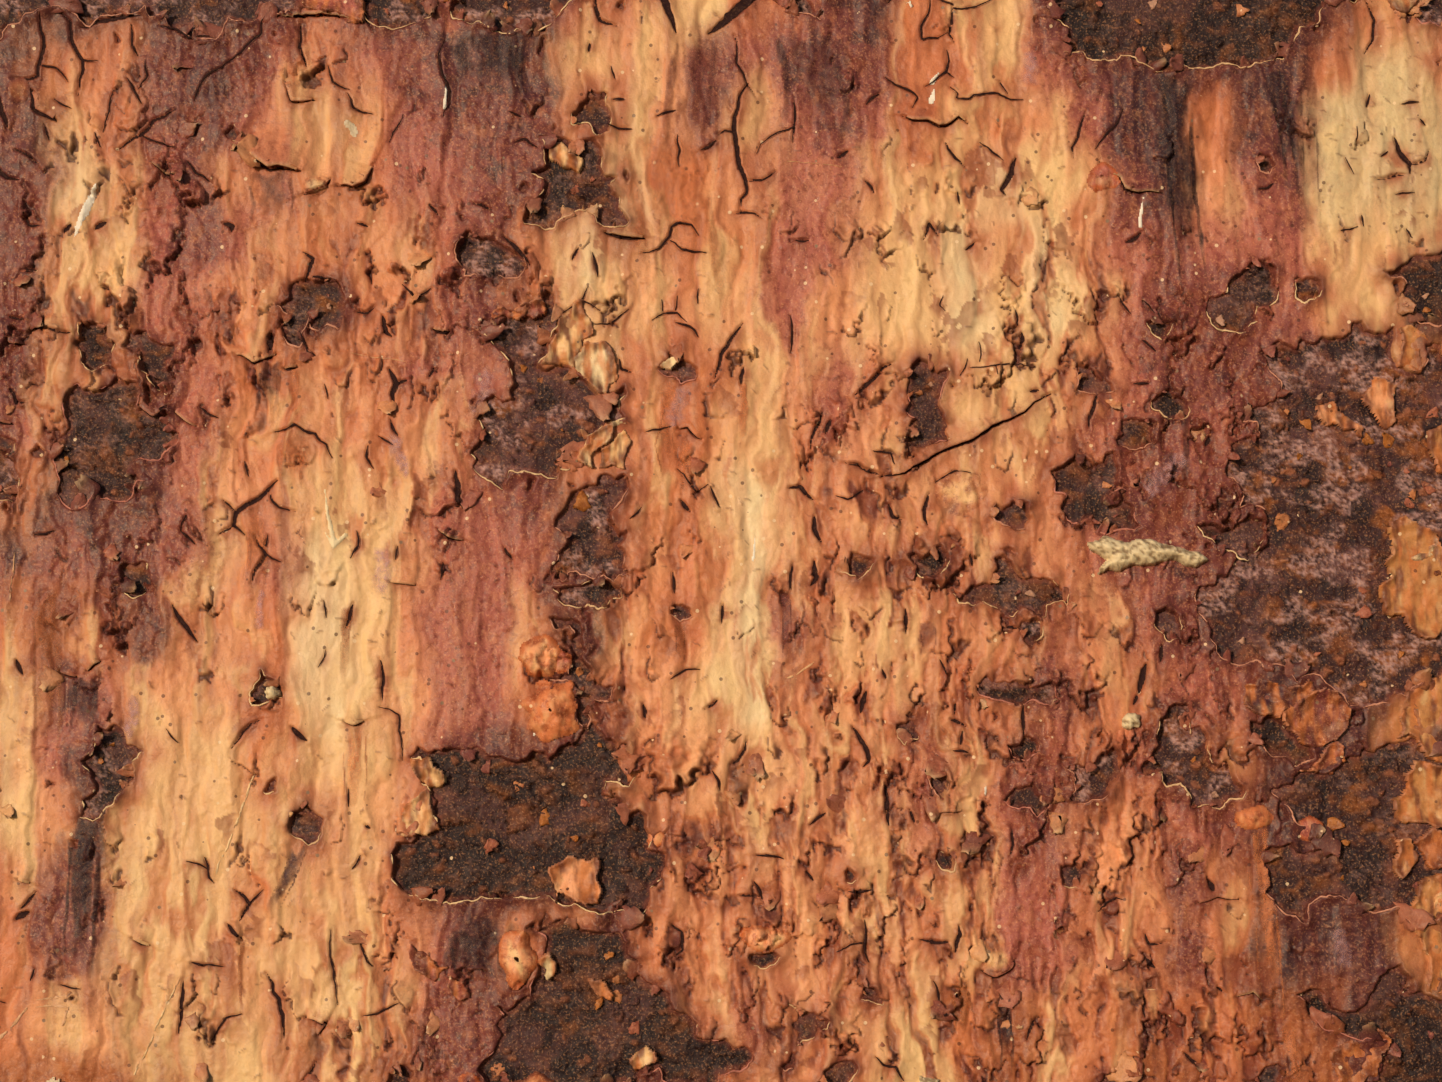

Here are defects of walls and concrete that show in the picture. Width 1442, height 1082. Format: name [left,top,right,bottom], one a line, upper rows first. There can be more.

crack [0,0,403,233]
rust [520,88,643,230]
crack [588,0,796,218]
crack [866,0,1023,204]
crack [789,310,1051,588]
rust [1194,252,1442,708]
peeling [1315,325,1442,438]
peeling [1378,515,1442,640]
rust [391,619,753,1082]
peeling [548,855,603,906]
rust [1246,719,1442,1082]
peeling [1391,674,1442,993]